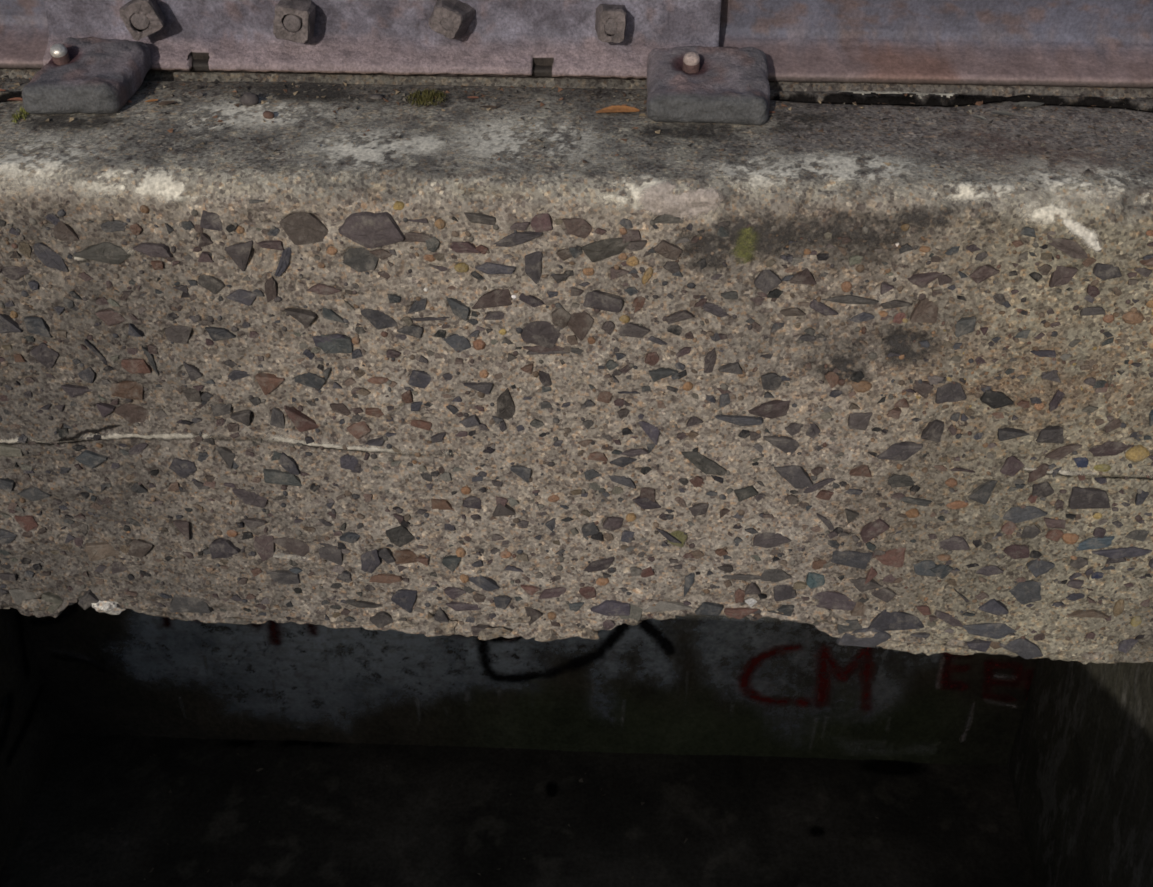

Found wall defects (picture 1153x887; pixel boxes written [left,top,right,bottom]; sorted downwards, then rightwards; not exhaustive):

crack [0,425,239,446]
crack [268,436,398,453]
crack [1024,467,1153,480]